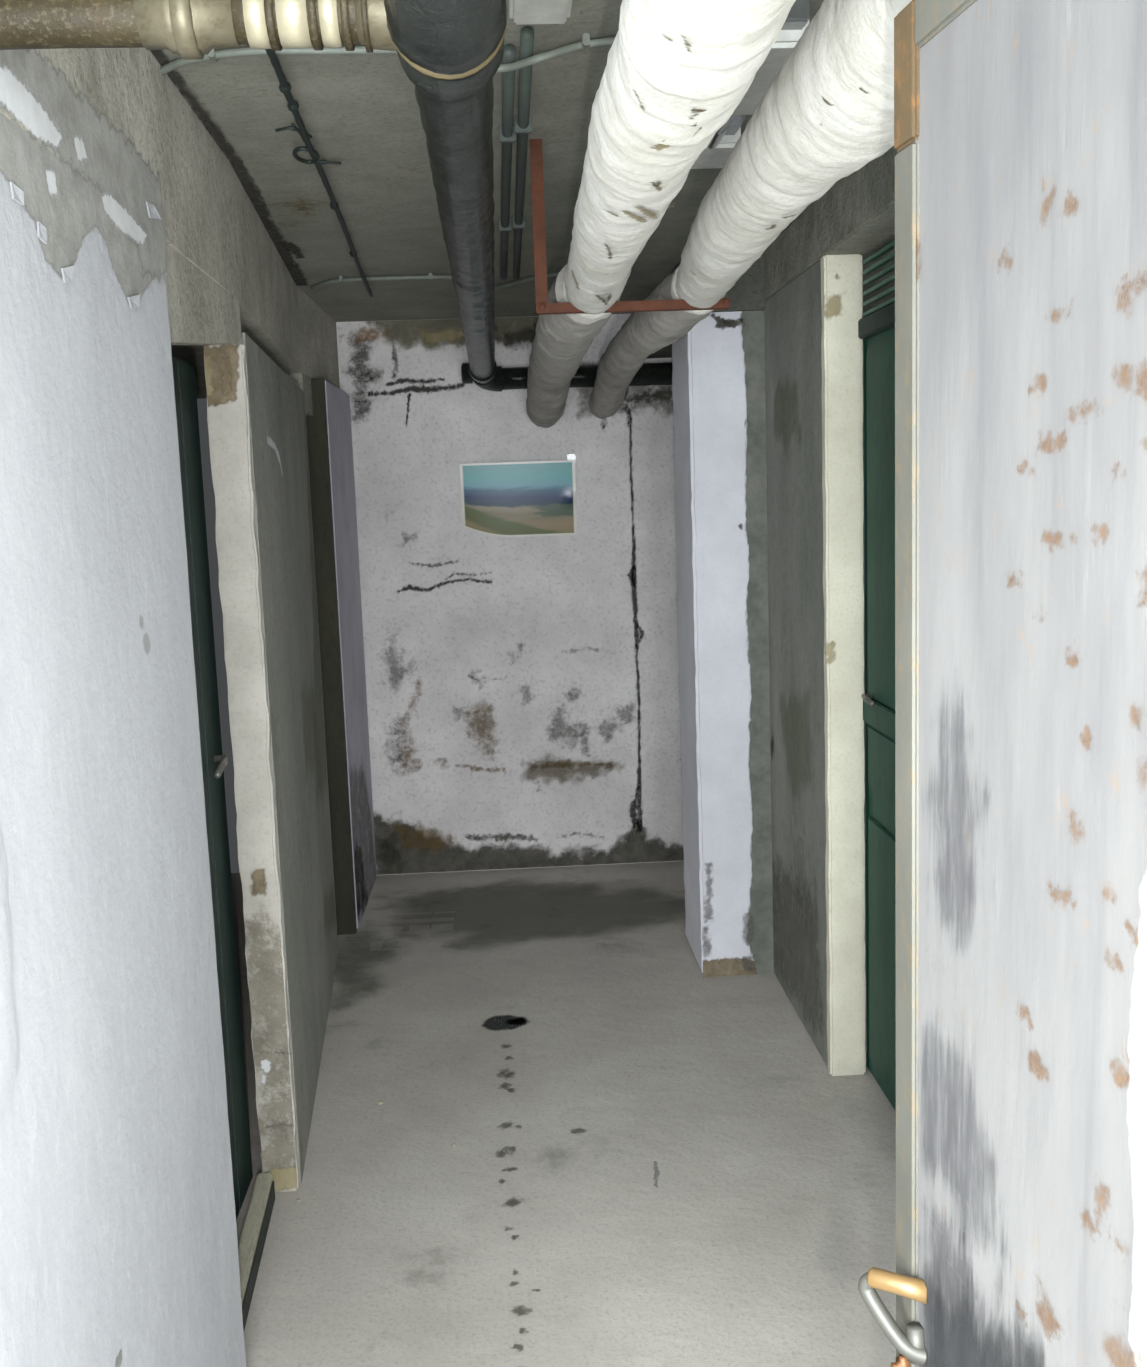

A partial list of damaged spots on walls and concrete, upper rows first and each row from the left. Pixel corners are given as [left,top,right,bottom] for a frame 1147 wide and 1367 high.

peeling [0,49,167,309]
crack [368,378,465,425]
crack [397,561,492,593]
crack [628,409,644,832]
damp [456,706,504,771]
damp [408,886,681,942]